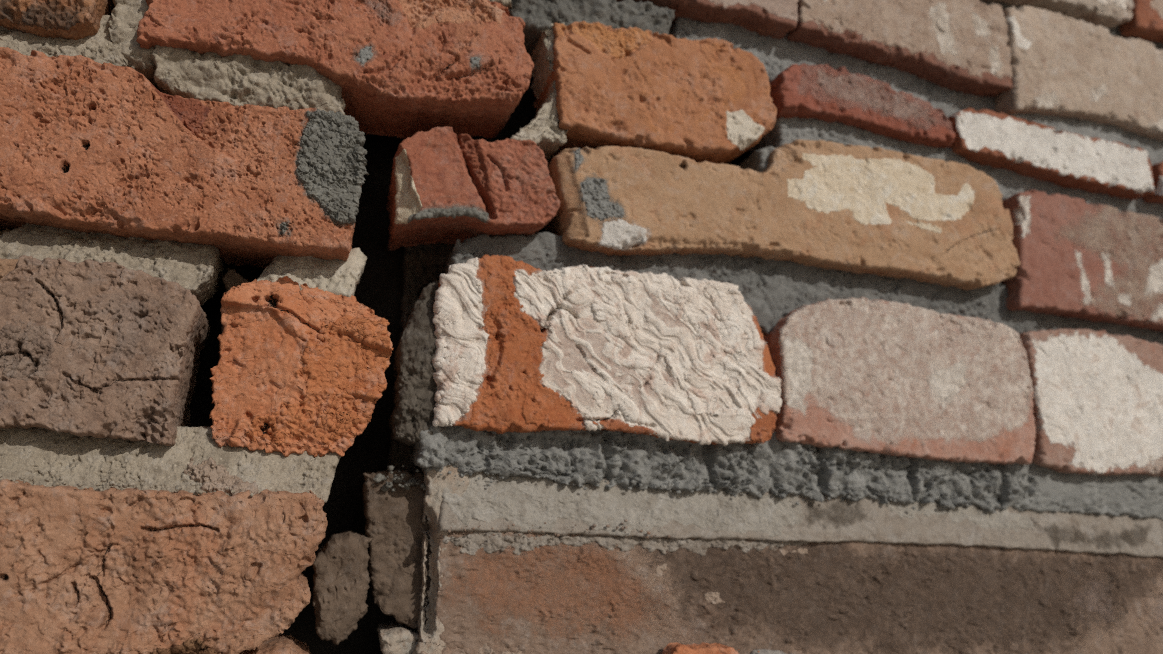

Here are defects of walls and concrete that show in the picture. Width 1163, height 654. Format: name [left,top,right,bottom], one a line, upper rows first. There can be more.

peeling [954,111,1163,195]
crack [0,283,63,374]
crack [67,376,175,400]
peeling [432,255,782,446]
peeling [1032,331,1163,475]
crack [75,546,112,625]